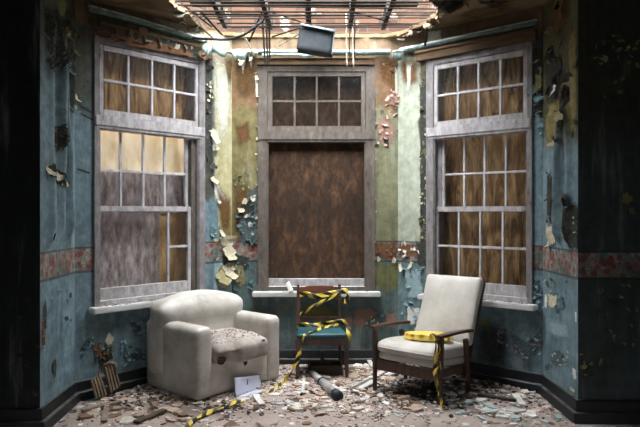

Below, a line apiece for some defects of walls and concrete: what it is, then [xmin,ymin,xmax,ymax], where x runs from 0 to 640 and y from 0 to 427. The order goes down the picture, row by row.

peeling [396,0,469,41]
peeling [55,124,70,151]
flaking render [86,4,258,247]
peeling [375,61,399,148]
peeling [527,44,544,134]
peeling [45,162,70,188]
peeling [544,172,555,247]
peeling [561,193,577,252]
peeling [344,267,424,329]
flaking render [80,319,147,372]
peeling [544,350,603,380]